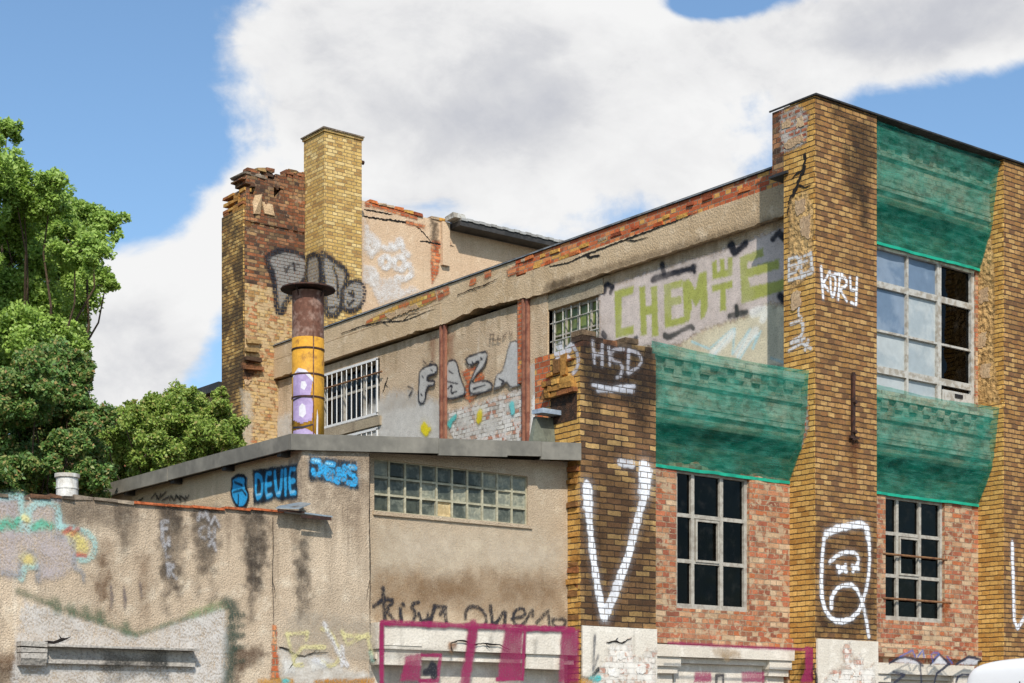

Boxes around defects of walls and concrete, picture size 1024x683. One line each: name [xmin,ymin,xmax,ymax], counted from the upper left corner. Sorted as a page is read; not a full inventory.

spalling [779,106,809,153]
crack [787,153,812,215]
crack [364,209,452,246]
crack [549,212,697,267]
flaking render [447,366,522,441]
water stain [247,535,265,587]